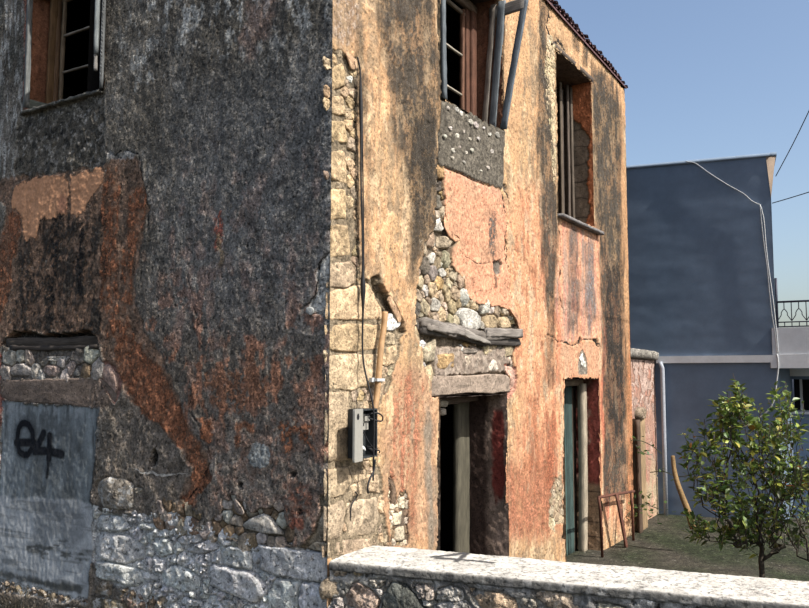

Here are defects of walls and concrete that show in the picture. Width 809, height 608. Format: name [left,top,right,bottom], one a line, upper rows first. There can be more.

peeling [11,167,103,241]
water stain [12,210,108,337]
spalling [0,346,122,404]
spalling [152,48,409,560]
water stain [378,0,441,274]
spalling [415,164,521,399]
water stain [537,2,558,384]
water stain [569,33,628,506]